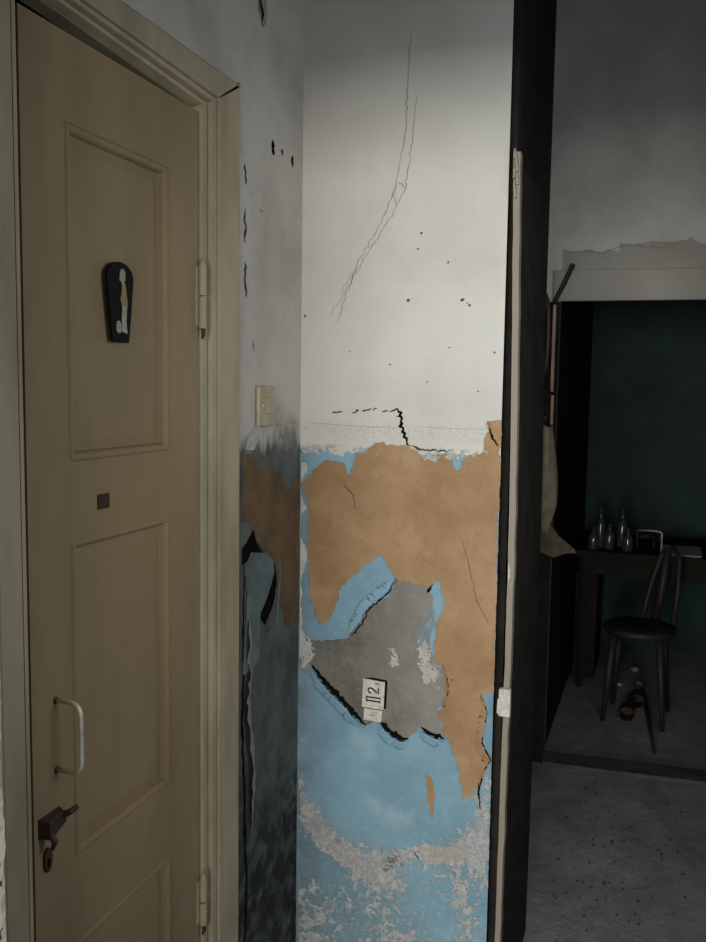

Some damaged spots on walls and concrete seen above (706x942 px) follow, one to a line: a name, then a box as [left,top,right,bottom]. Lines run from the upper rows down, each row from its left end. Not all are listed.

crack [329,39,417,319]
crack [389,408,481,452]
peeling [241,420,502,942]